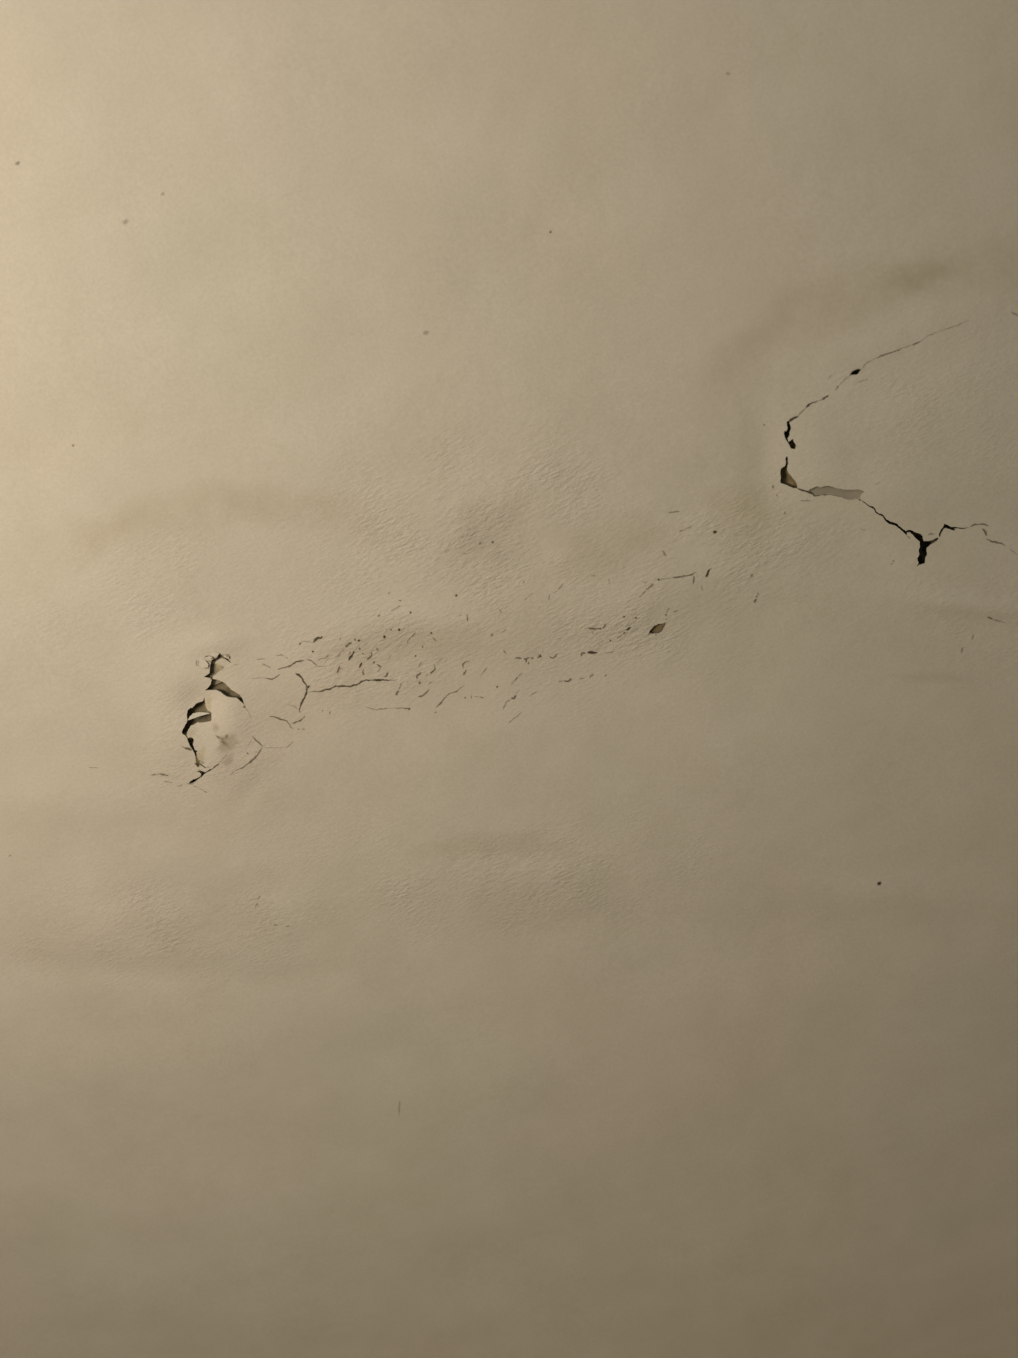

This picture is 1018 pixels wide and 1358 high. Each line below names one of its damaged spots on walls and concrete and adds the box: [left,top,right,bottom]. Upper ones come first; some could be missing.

crack [763,341,920,496]
crack [859,499,1002,566]
peeling [182,652,245,784]
crack [237,600,469,770]
crack [496,569,710,699]